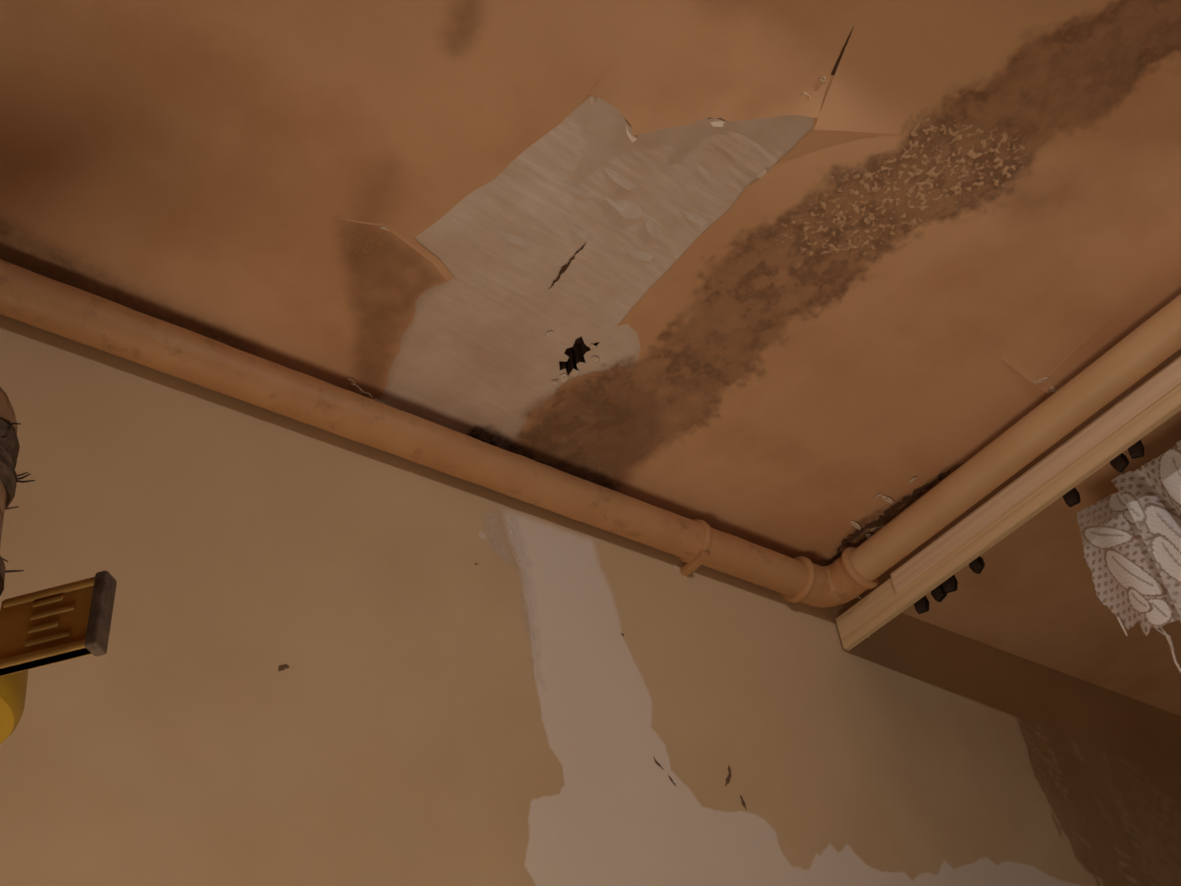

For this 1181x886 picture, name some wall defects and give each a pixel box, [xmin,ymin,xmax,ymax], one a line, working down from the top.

peeling [347,39,836,451]
damp [743,114,1027,304]
damp [467,263,780,489]